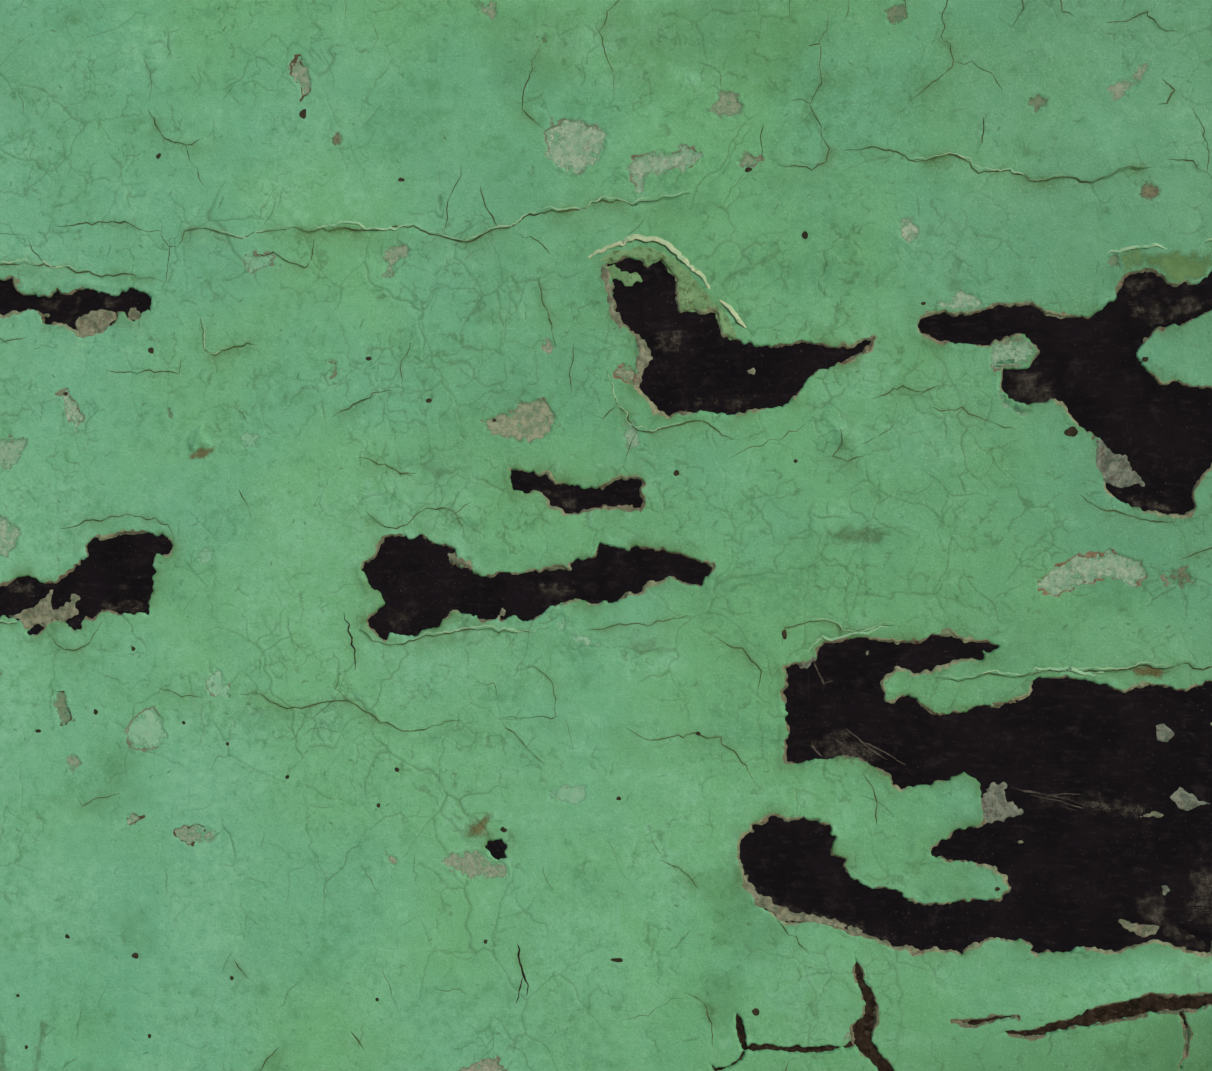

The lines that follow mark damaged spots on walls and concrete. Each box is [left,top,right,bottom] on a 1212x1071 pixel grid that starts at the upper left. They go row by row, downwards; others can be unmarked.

spalling [543,117,606,174]
peeling [0,275,151,338]
peeling [588,234,877,419]
spalling [481,397,554,443]
peeling [917,243,1212,519]
peeling [508,467,647,516]
peeling [0,529,173,637]
peeling [360,533,716,642]
spalling [1037,548,1195,597]
peeling [737,626,1212,958]
crack [624,962,894,1071]
crack [950,992,1212,1070]